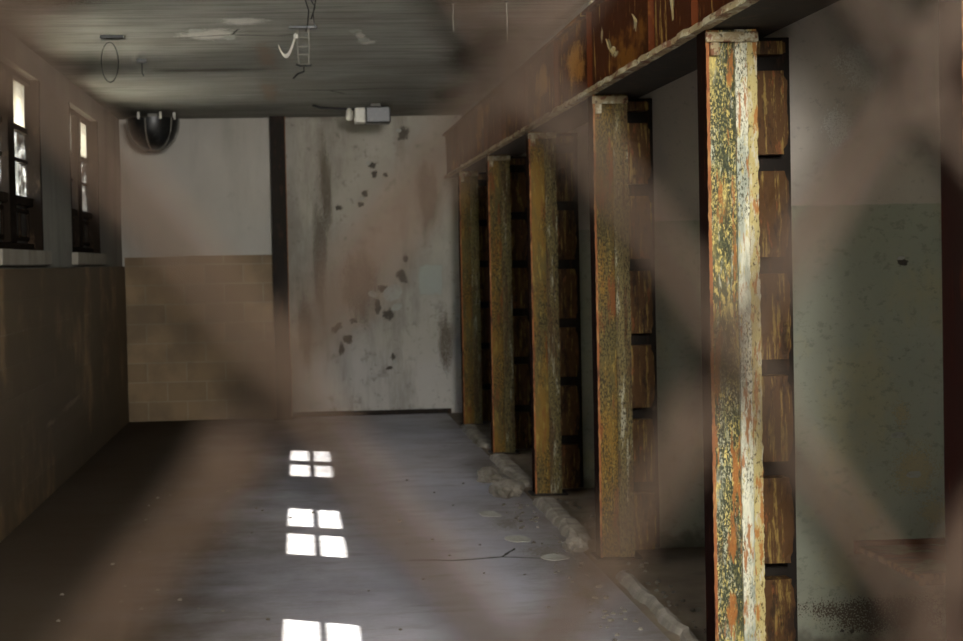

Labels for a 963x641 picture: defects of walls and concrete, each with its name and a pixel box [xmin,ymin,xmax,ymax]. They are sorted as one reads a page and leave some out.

peeling [367,254,409,321]